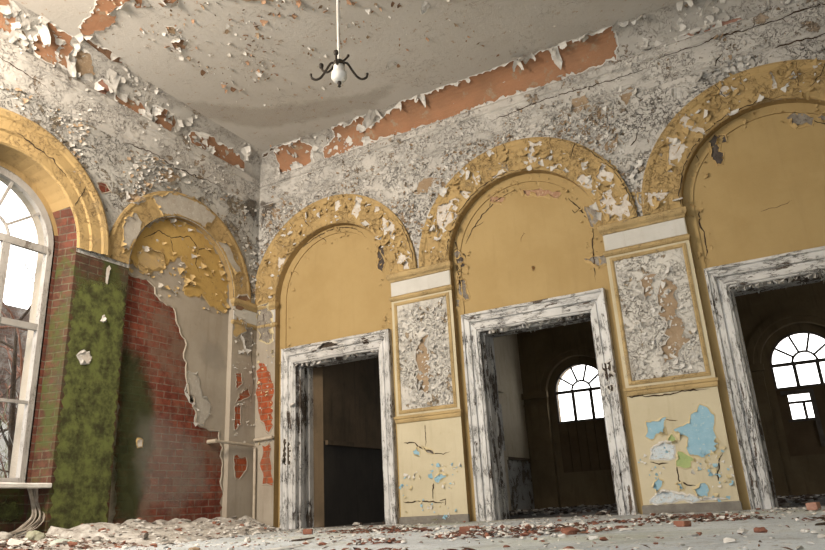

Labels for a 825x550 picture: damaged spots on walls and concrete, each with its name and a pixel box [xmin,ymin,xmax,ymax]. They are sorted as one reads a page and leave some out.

crack [491,4,825,258]
peeling [632,0,825,188]
flaking render [0,0,683,523]
crack [568,198,596,281]
peeling [617,255,699,377]
crack [405,432,448,455]
peeling [638,404,734,505]